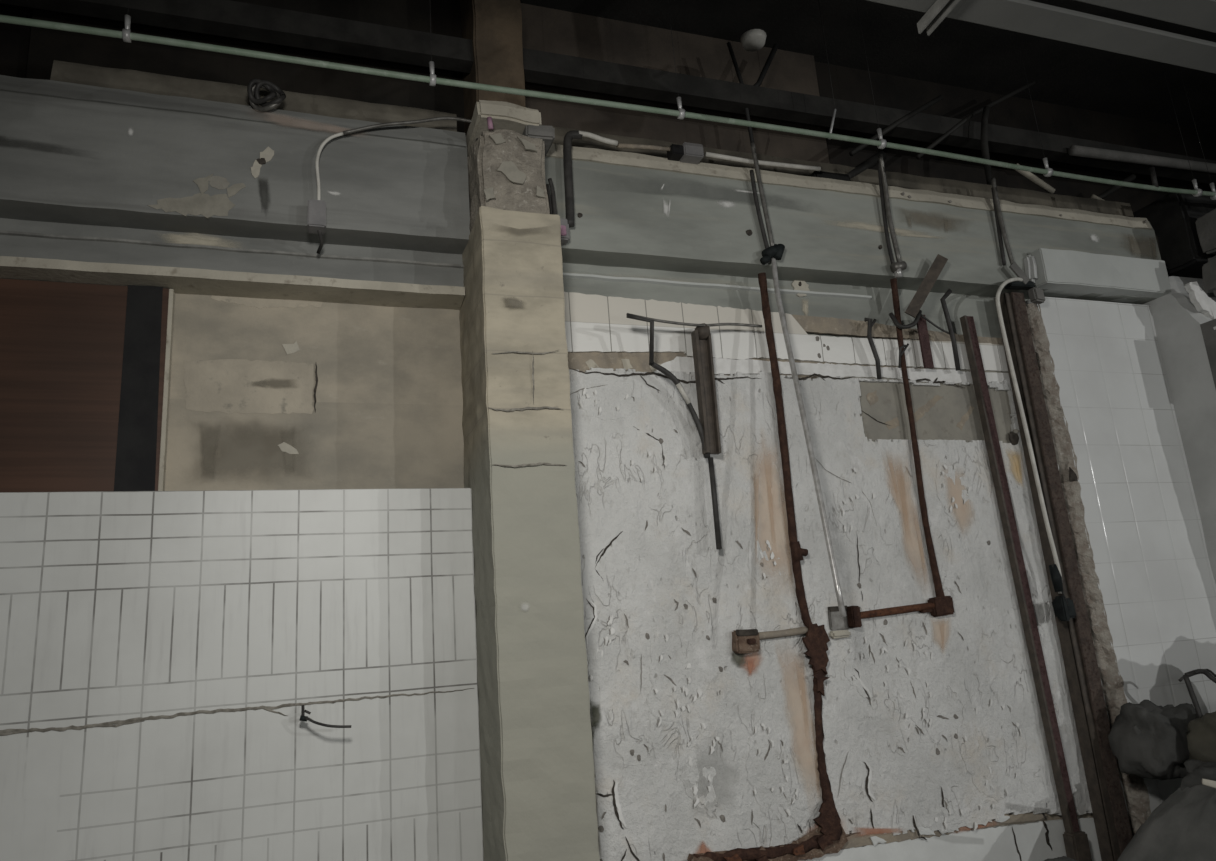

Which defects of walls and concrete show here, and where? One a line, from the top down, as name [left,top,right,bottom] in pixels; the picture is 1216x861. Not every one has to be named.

damp [0,138,57,152]
spalling [147,147,274,219]
crack [491,350,854,412]
spalling [860,386,1007,439]
corrosion [758,458,789,569]
corrosion [889,472,923,566]
spalling [1026,303,1127,729]
crack [585,531,623,645]
crack [0,688,472,736]
corrosion [785,664,817,780]
crack [596,780,640,861]
flaking render [842,799,1047,849]